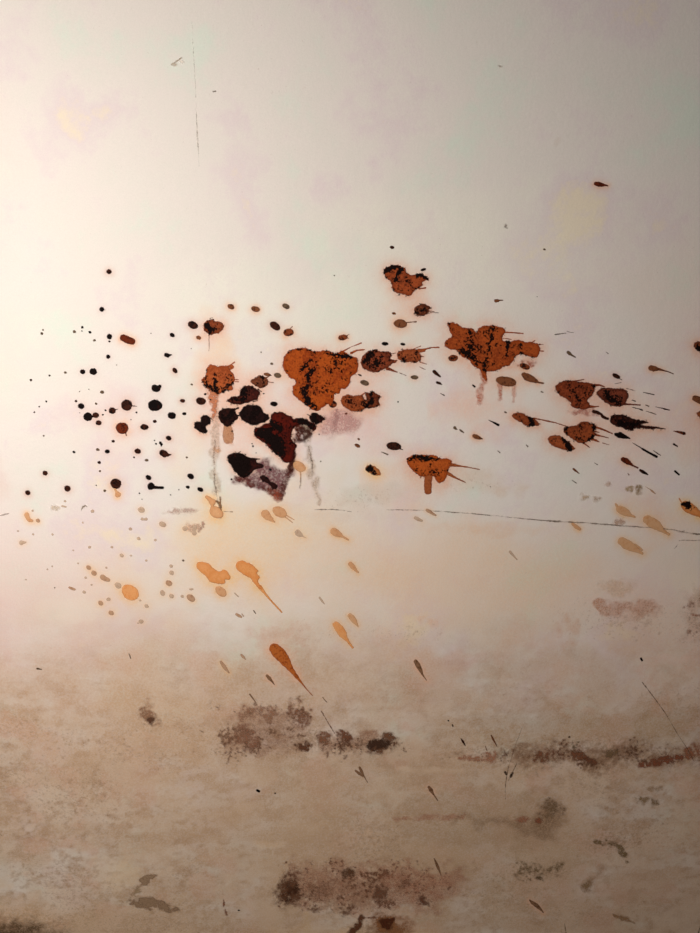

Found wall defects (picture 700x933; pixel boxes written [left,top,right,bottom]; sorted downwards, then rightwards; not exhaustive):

crack [520,518,638,527]
leakage [218,698,404,759]
leakage [458,740,597,771]
leakage [606,744,700,767]
leakage [275,862,317,911]
leakage [323,861,434,914]